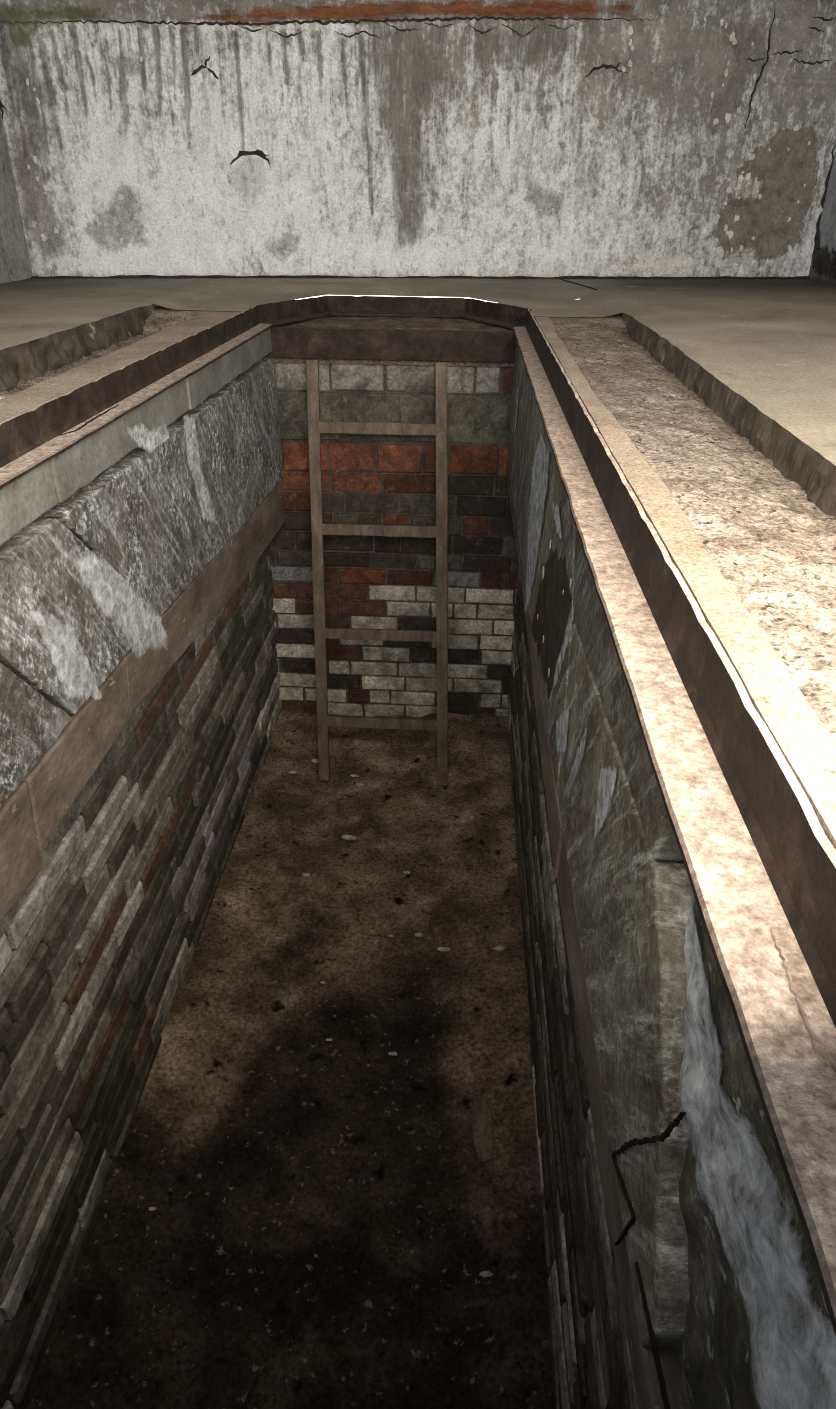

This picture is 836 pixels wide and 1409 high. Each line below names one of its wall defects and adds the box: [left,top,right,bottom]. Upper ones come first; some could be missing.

damp [0,9,97,154]
damp [110,26,199,107]
crack [230,149,270,165]
damp [269,30,323,79]
crack [0,16,654,80]
damp [341,27,452,245]
rust [207,0,630,23]
crack [742,10,836,128]
spalling [0,356,639,1409]
spalling [672,896,836,1409]
crack [611,1112,686,1409]